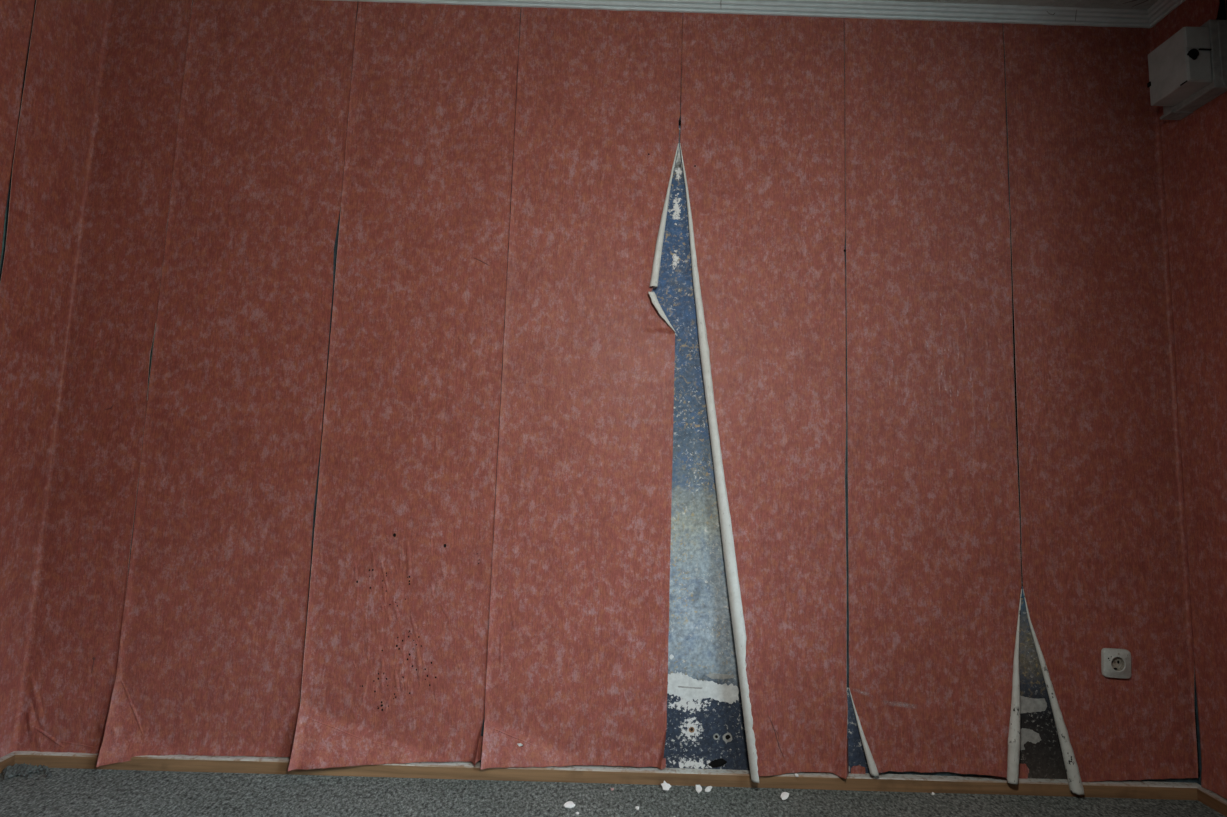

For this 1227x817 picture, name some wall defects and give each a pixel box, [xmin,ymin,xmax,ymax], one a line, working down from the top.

flaking render [651,125,750,770]
flaking render [845,423,882,774]
flaking render [1009,206,1067,779]